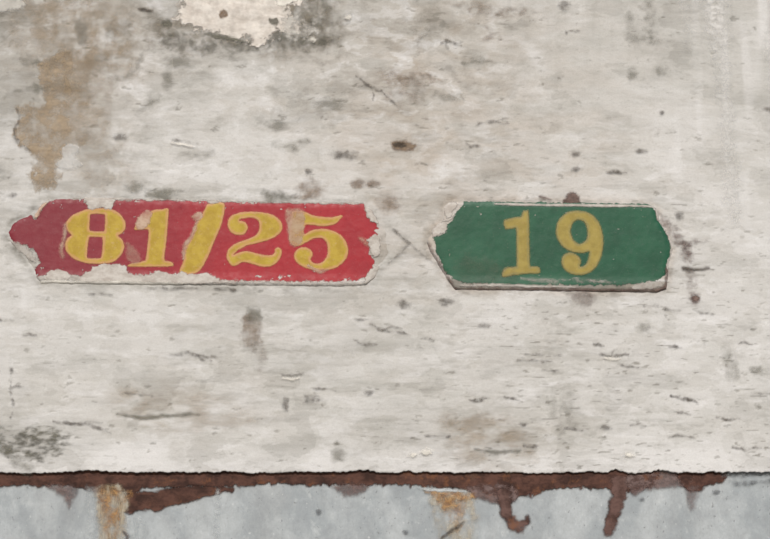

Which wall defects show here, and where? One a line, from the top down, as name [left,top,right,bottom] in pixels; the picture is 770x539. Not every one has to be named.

peeling [162,0,317,47]
leakage [285,0,329,45]
corrosion [0,469,727,539]